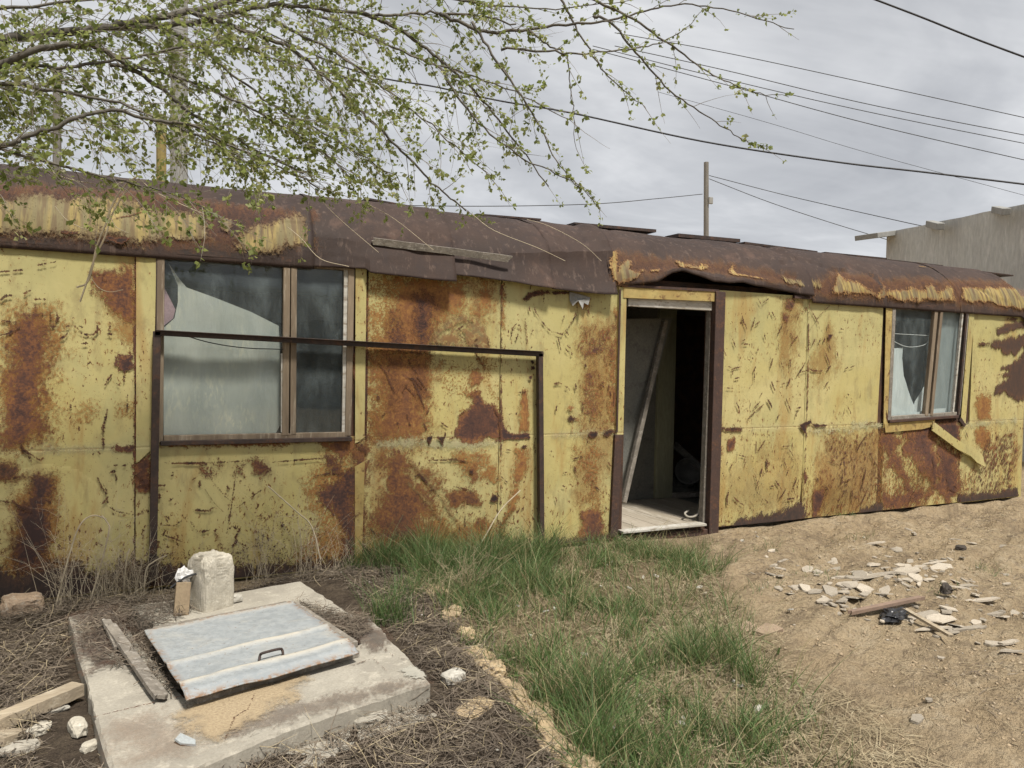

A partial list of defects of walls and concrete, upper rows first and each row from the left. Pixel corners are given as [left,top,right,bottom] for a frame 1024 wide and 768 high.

peeling [0,191,315,255]
corrosion [0,298,191,603]
corrosion [88,257,618,578]
corrosion [721,298,1022,527]
peeling [782,273,1024,403]